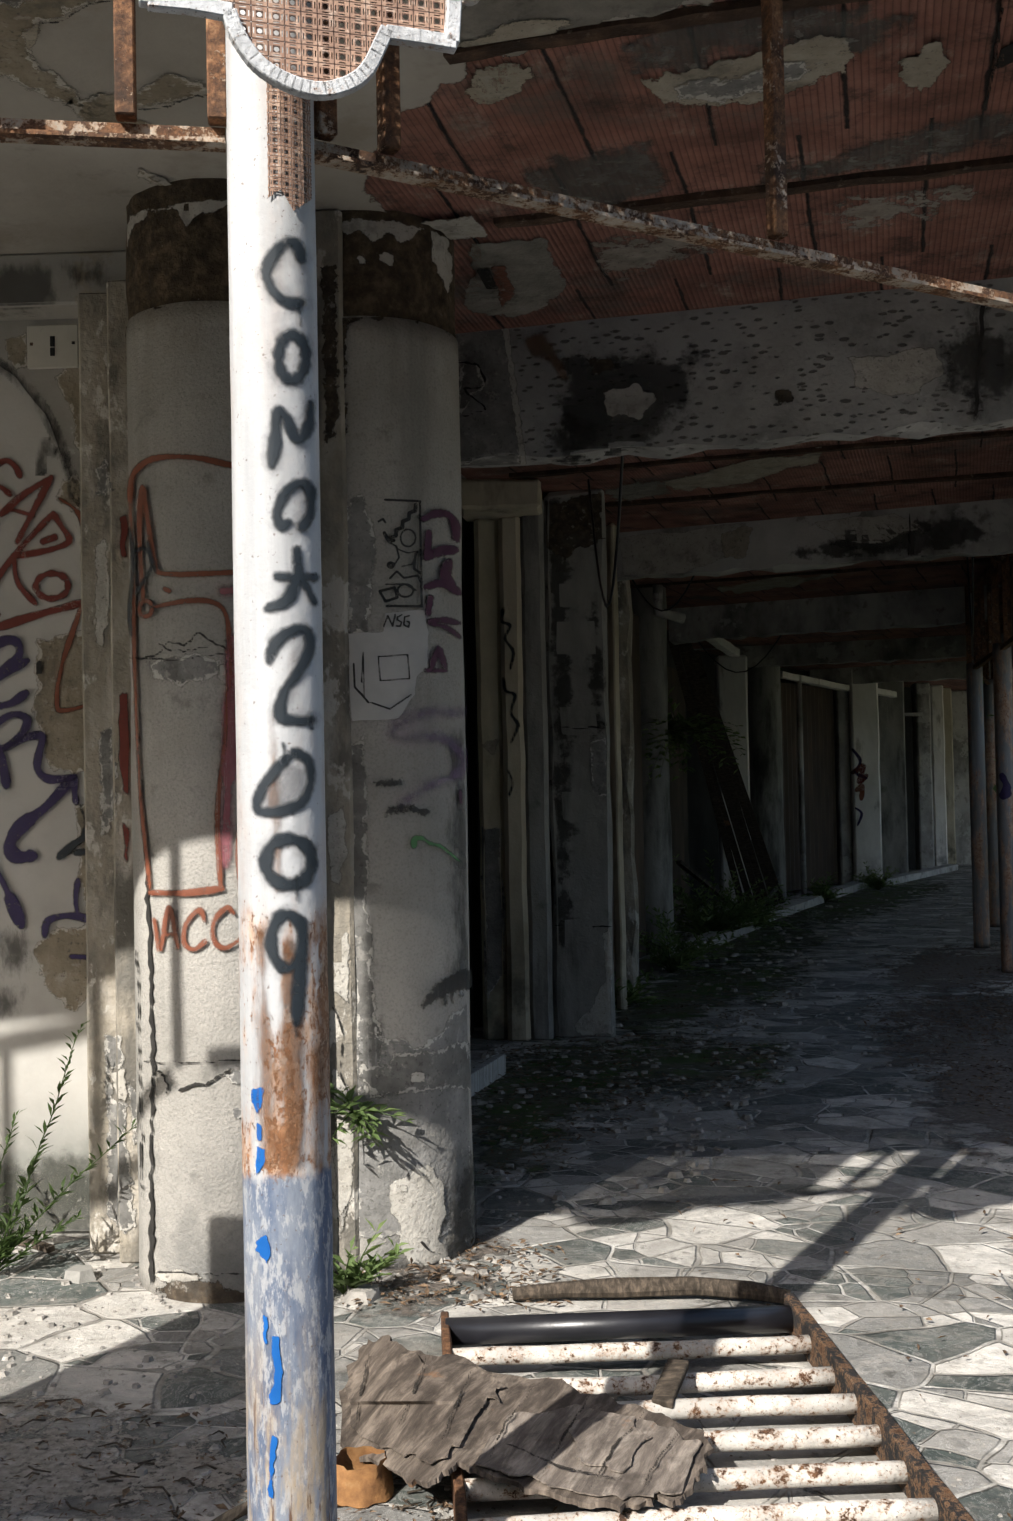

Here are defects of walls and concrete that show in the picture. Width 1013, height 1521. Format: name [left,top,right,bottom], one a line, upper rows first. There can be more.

flaking render [0,0,207,124]
peeling [127,199,227,247]
flaking render [319,264,384,453]
leakage [550,345,702,464]
leakage [942,329,1013,417]
flaking render [347,493,377,634]
flaking render [480,827,506,1000]
crack [135,874,241,1283]
corrosion [260,940,320,1166]
flaking render [327,735,471,1267]